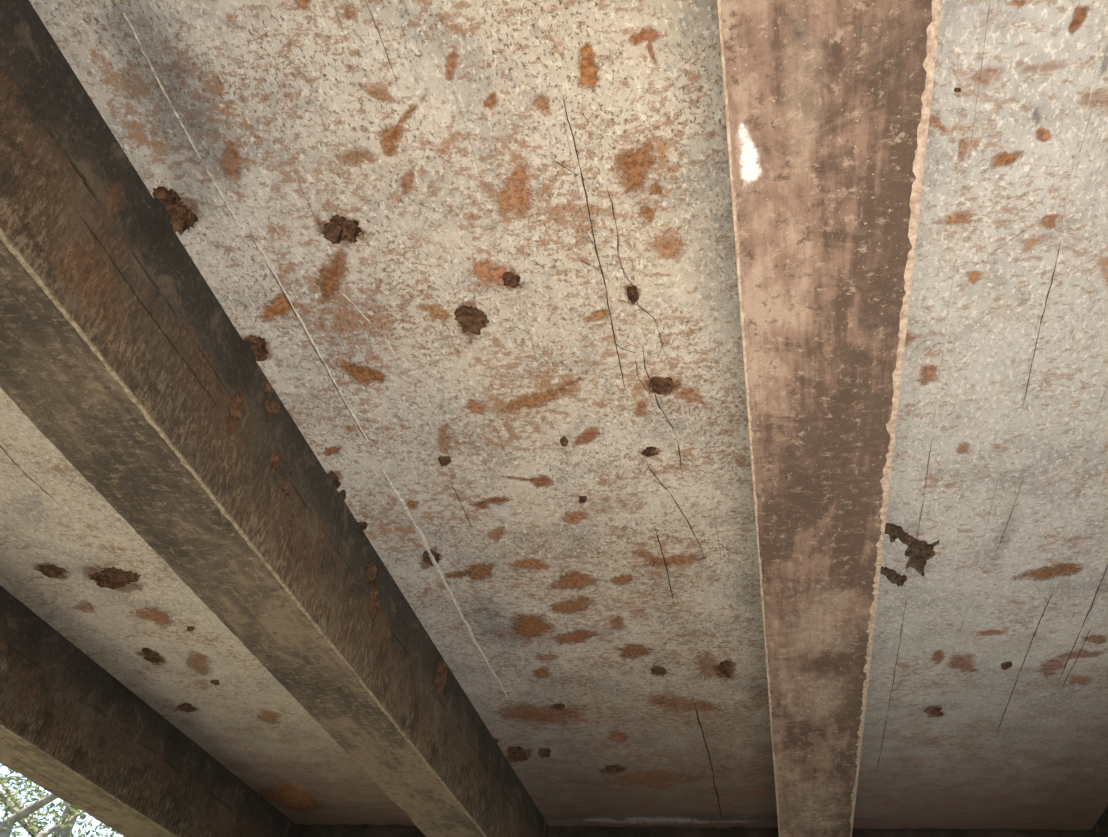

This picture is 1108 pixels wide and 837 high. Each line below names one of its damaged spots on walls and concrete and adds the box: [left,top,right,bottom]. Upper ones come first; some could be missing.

rust [578,44,599,89]
rust [629,27,662,62]
rust [612,143,662,222]
spalling [322,214,362,244]
crack [255,244,376,456]
spalling [454,305,489,335]
crack [554,99,705,558]
crack [1023,240,1061,404]
spalling [88,566,142,590]
spalling [880,523,940,587]
rust [513,572,597,678]
crack [1059,565,1108,686]